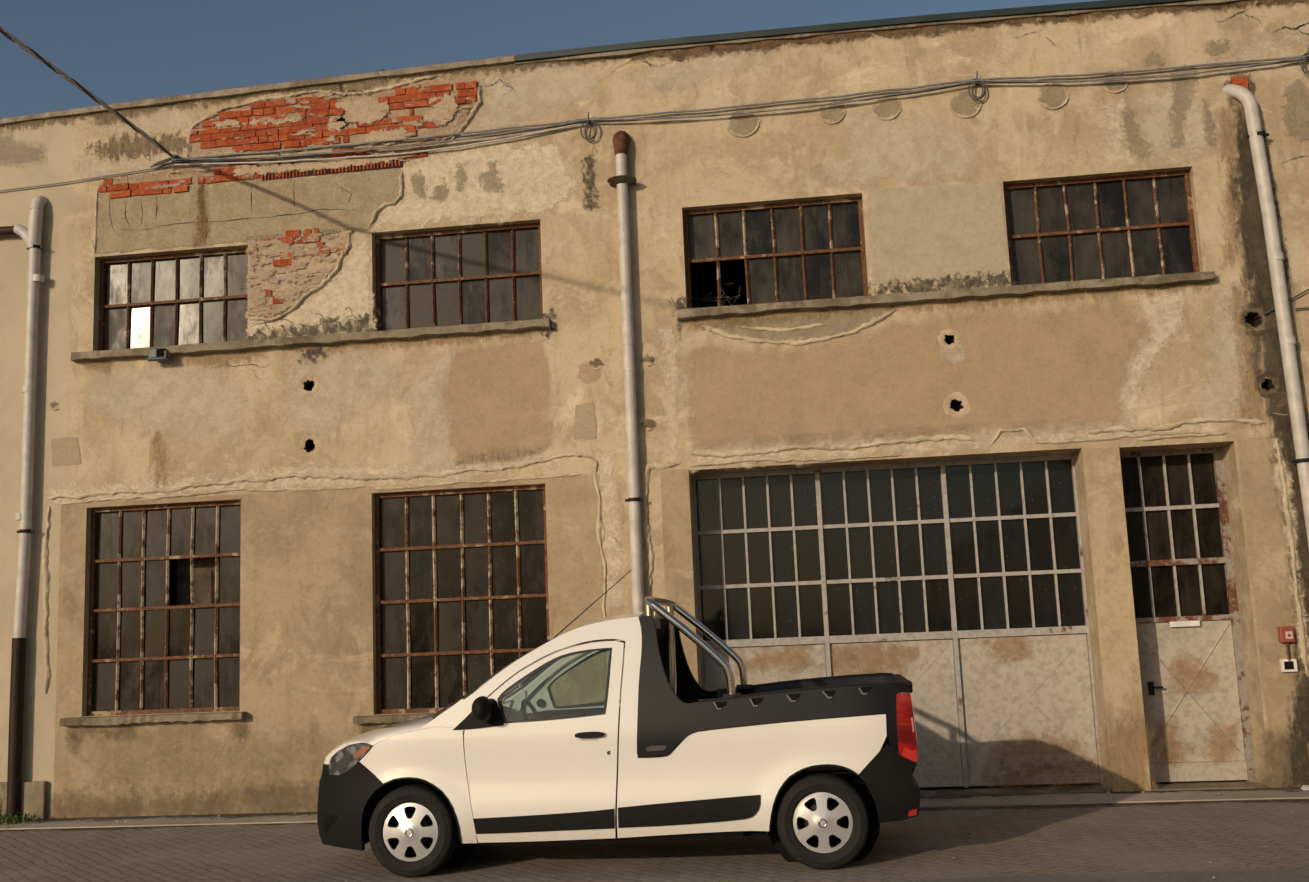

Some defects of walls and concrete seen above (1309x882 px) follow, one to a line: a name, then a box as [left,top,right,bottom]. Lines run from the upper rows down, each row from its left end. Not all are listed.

flaking render [80,0,1309,338]
leakage [1229,98,1309,788]